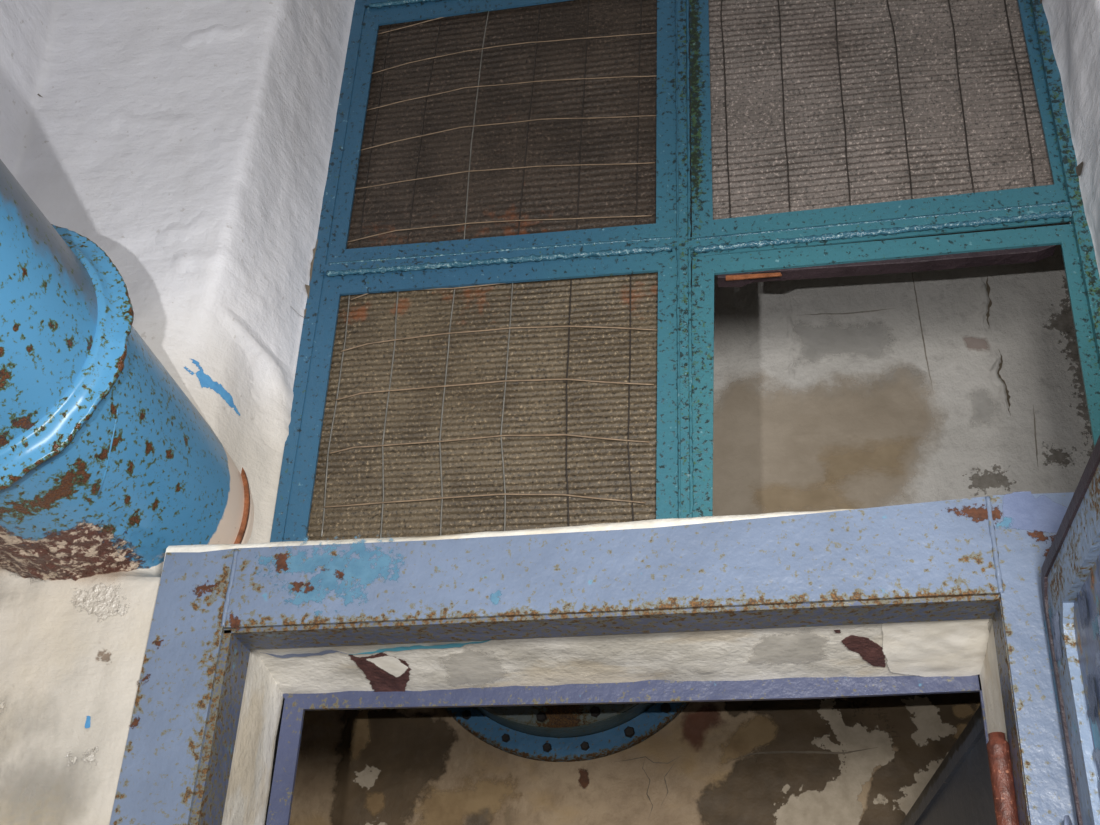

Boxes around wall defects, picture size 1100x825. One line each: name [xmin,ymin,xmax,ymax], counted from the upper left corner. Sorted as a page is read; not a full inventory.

crack [985,276,993,325]
leakage [1043,275,1080,361]
crack [997,351,1038,465]
leakage [1042,442,1077,467]
corrosion [945,503,1002,524]
corrosion [193,580,217,597]
peeling [255,536,404,615]
corrosion [229,611,241,631]
spalling [349,653,412,692]
leakage [697,692,981,825]